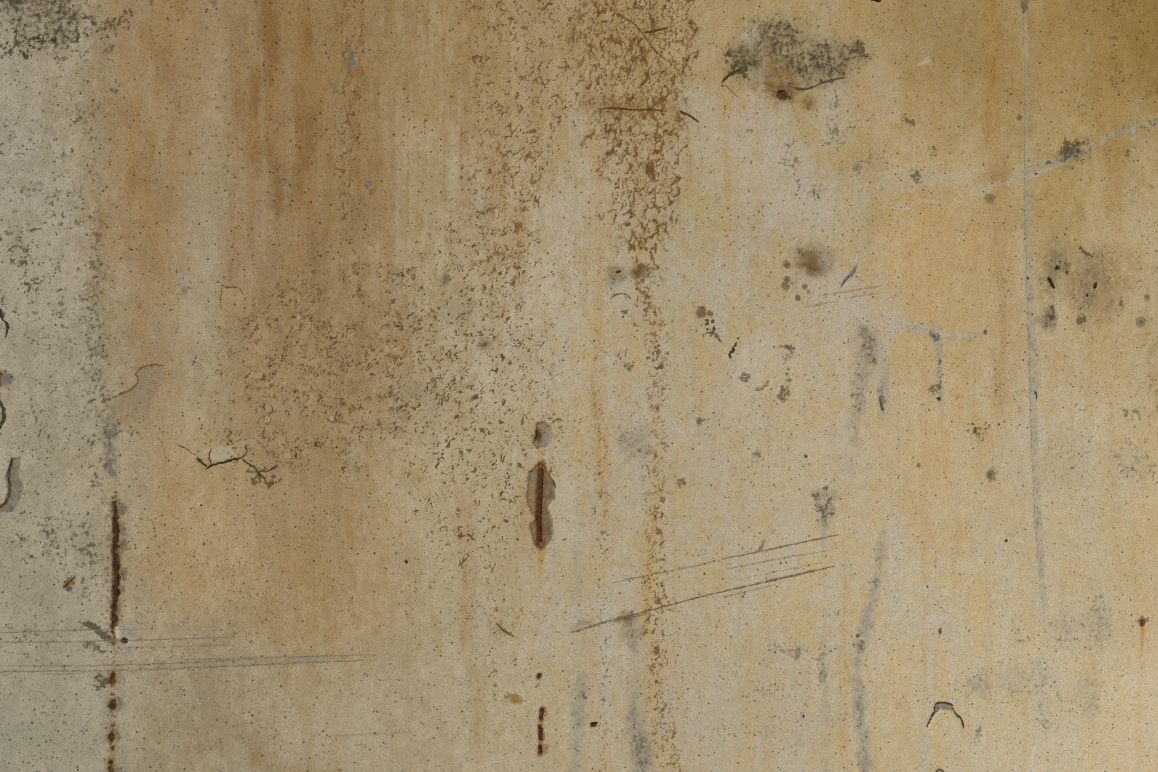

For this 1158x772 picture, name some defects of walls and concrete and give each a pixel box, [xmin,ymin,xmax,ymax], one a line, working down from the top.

water stain [364,0,428,257]
peeling [580,0,721,101]
peeling [0,236,53,517]
corrosion [97,490,133,629]
water stain [0,0,405,772]
crack [175,444,284,494]
peeling [206,94,705,772]
water stain [544,0,1158,772]
corrosion [83,653,128,772]
corrosion [536,705,550,761]